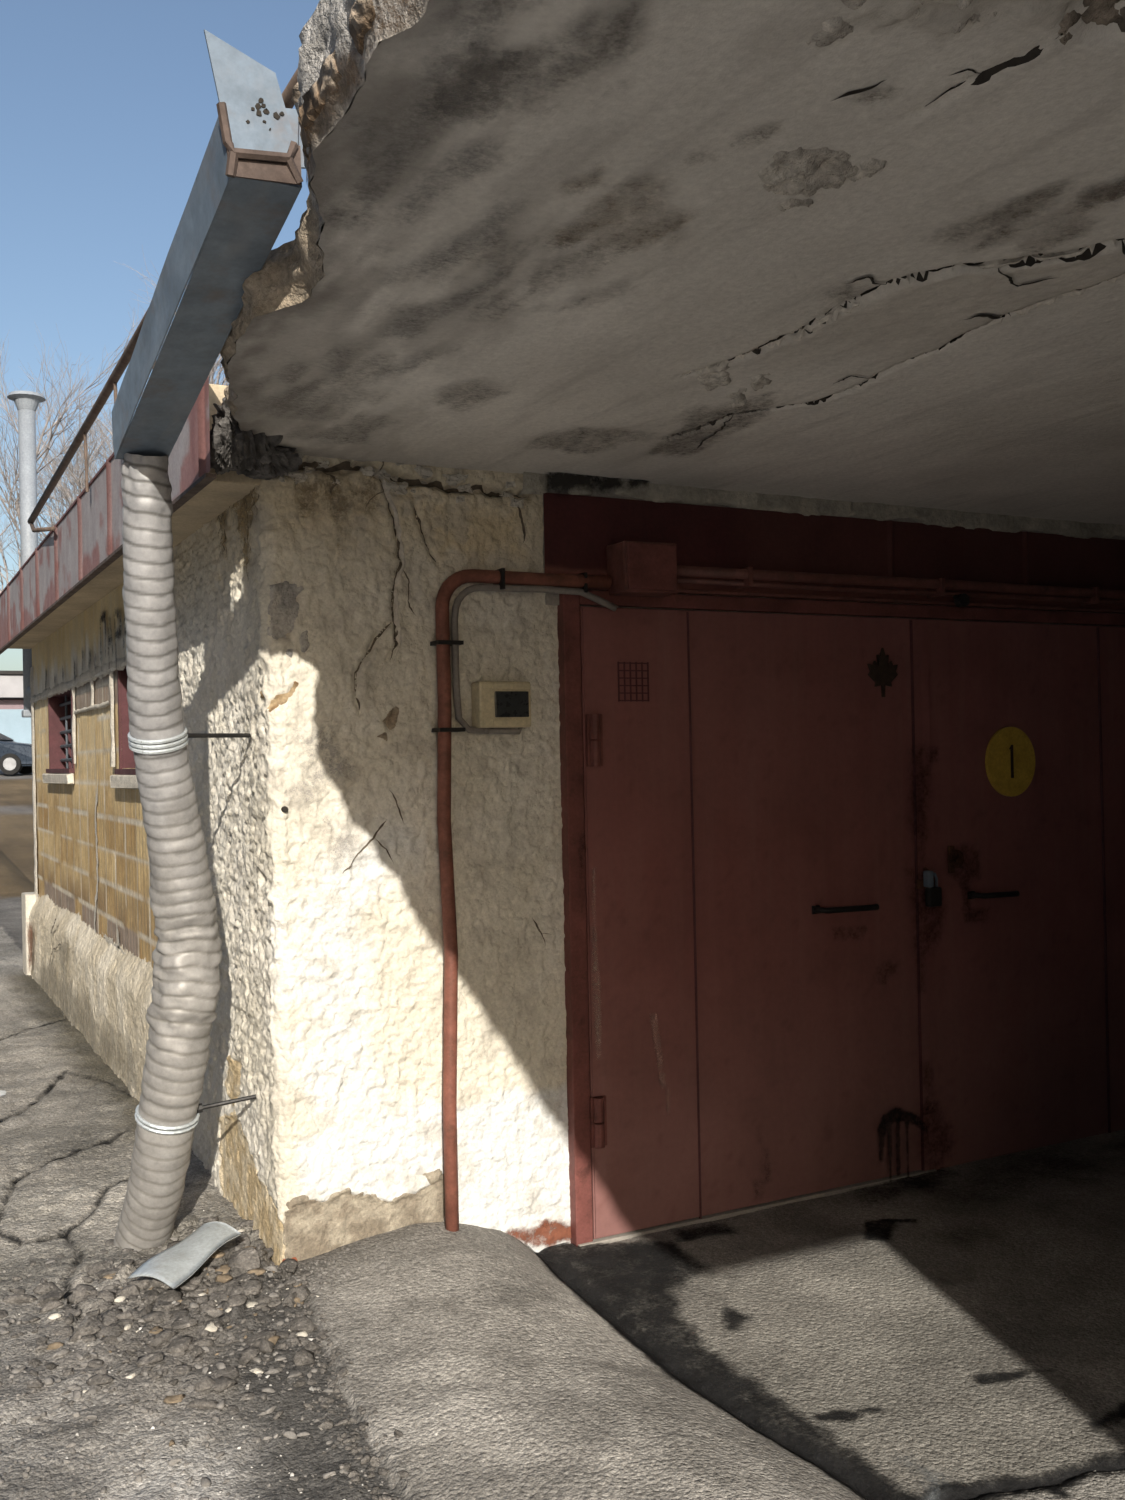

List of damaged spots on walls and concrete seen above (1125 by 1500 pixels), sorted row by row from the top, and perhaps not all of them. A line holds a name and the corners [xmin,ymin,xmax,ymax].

spalling [349,0,376,55]
peeling [806,0,866,47]
spalling [1058,0,1125,45]
spalling [291,50,343,162]
spalling [758,147,887,212]
crack [682,238,1125,377]
crack [672,373,878,448]
water stain [547,472,649,494]
peeling [267,581,310,658]
crack [278,454,526,710]